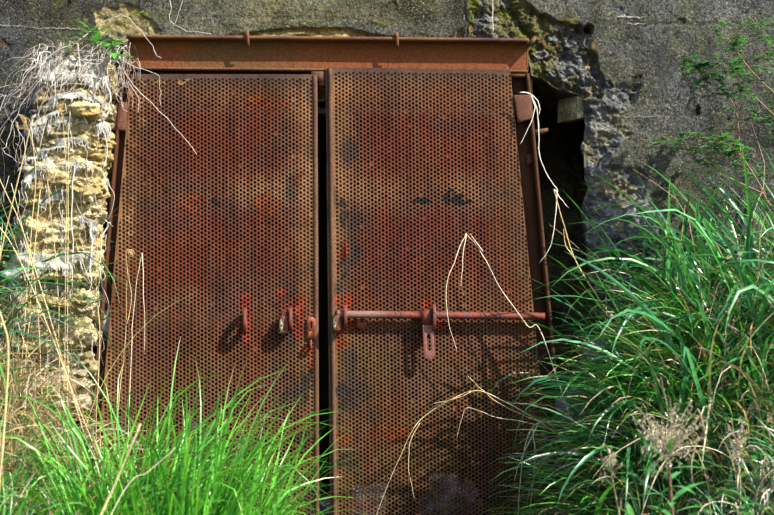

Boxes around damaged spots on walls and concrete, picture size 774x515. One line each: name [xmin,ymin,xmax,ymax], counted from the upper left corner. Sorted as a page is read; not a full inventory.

corrosion [246,94,288,114]
spalling [453,0,661,298]
corrosion [177,193,203,213]
corrosion [255,191,282,216]
corrosion [124,194,137,255]
corrosion [371,425,422,448]